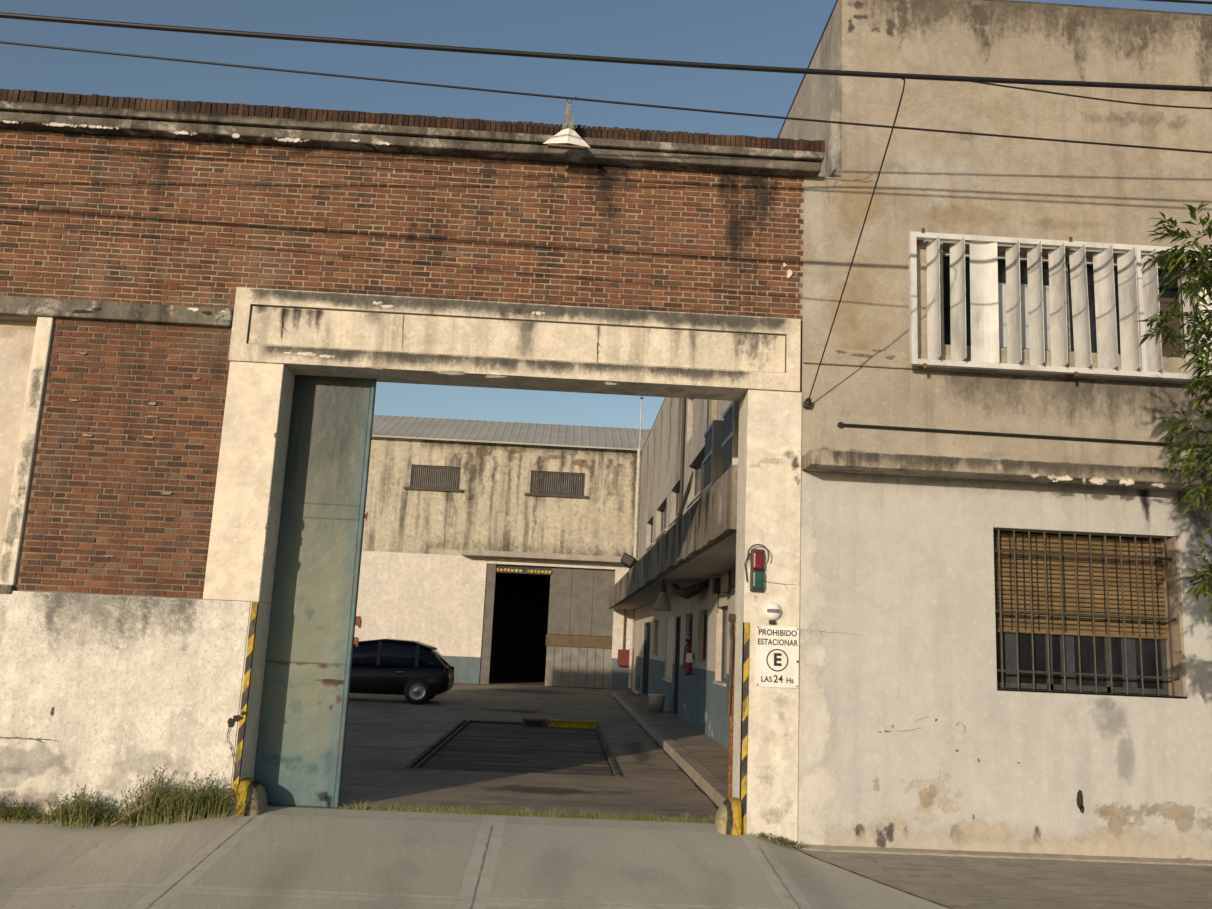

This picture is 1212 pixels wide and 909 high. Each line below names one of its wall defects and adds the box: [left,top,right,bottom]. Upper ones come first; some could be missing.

water stain [848,0,1212,81]
water stain [252,289,786,351]
water stain [266,346,746,379]
water stain [423,433,662,511]
water stain [833,451,1212,556]
peeling [1033,474,1134,485]
water stain [42,592,196,631]